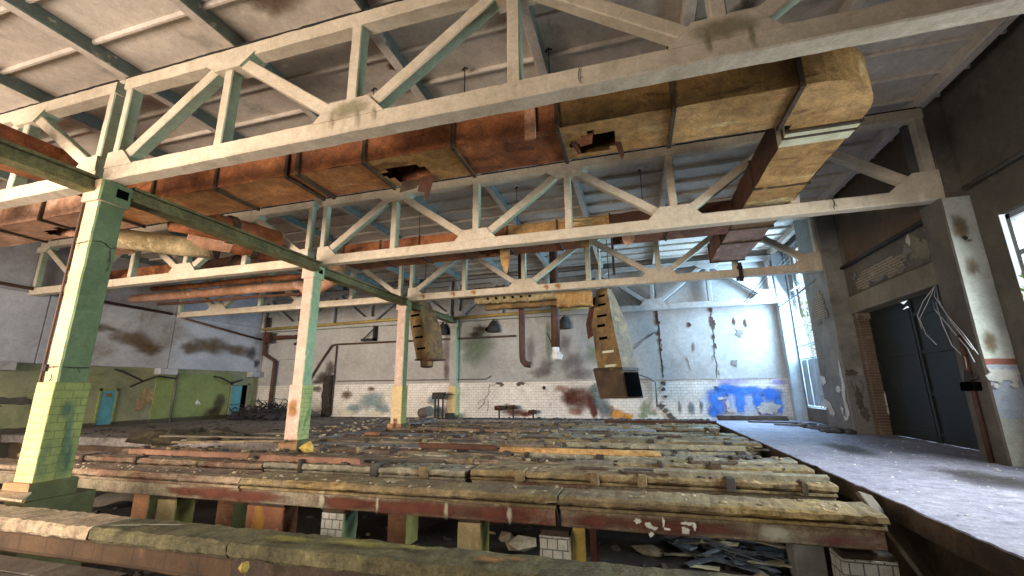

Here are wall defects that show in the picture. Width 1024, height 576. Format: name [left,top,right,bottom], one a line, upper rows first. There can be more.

flaking render [853,231,931,290]
damp [98,325,159,354]
damp [183,340,259,367]
flaking render [819,359,870,422]
spalling [985,367,1021,388]